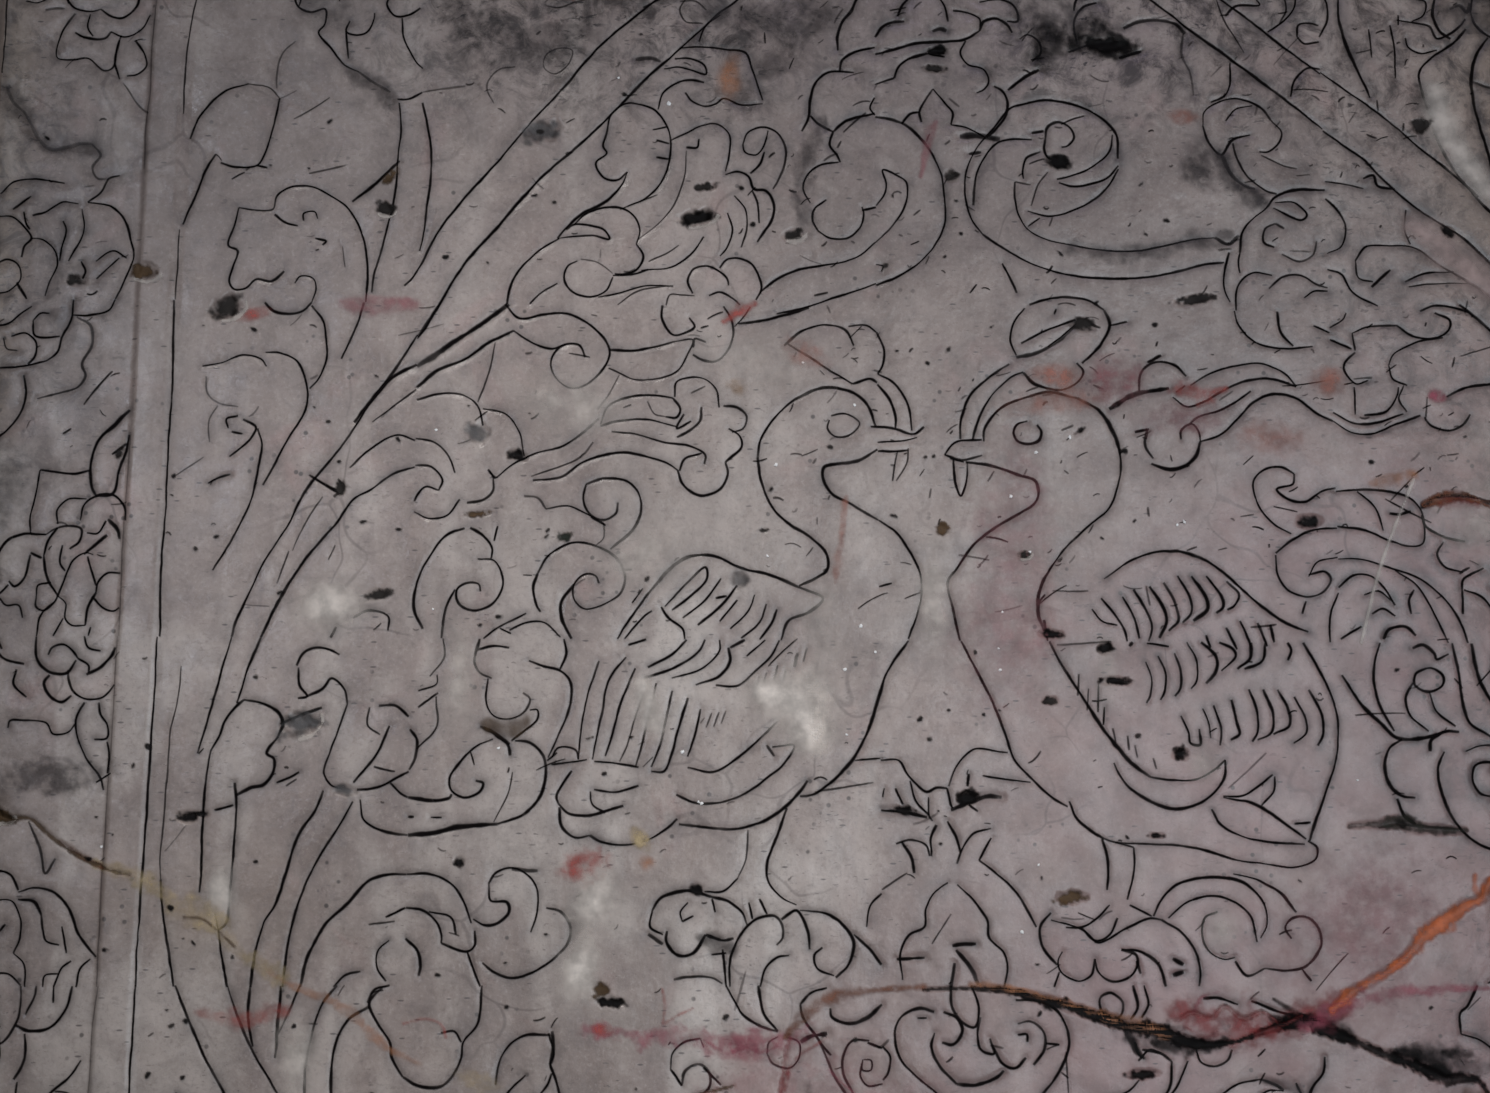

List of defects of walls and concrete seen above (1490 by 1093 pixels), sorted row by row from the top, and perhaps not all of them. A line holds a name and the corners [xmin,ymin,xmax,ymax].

crack [0,815,130,876]
crack [1349,814,1468,834]
crack [783,874,1490,1093]